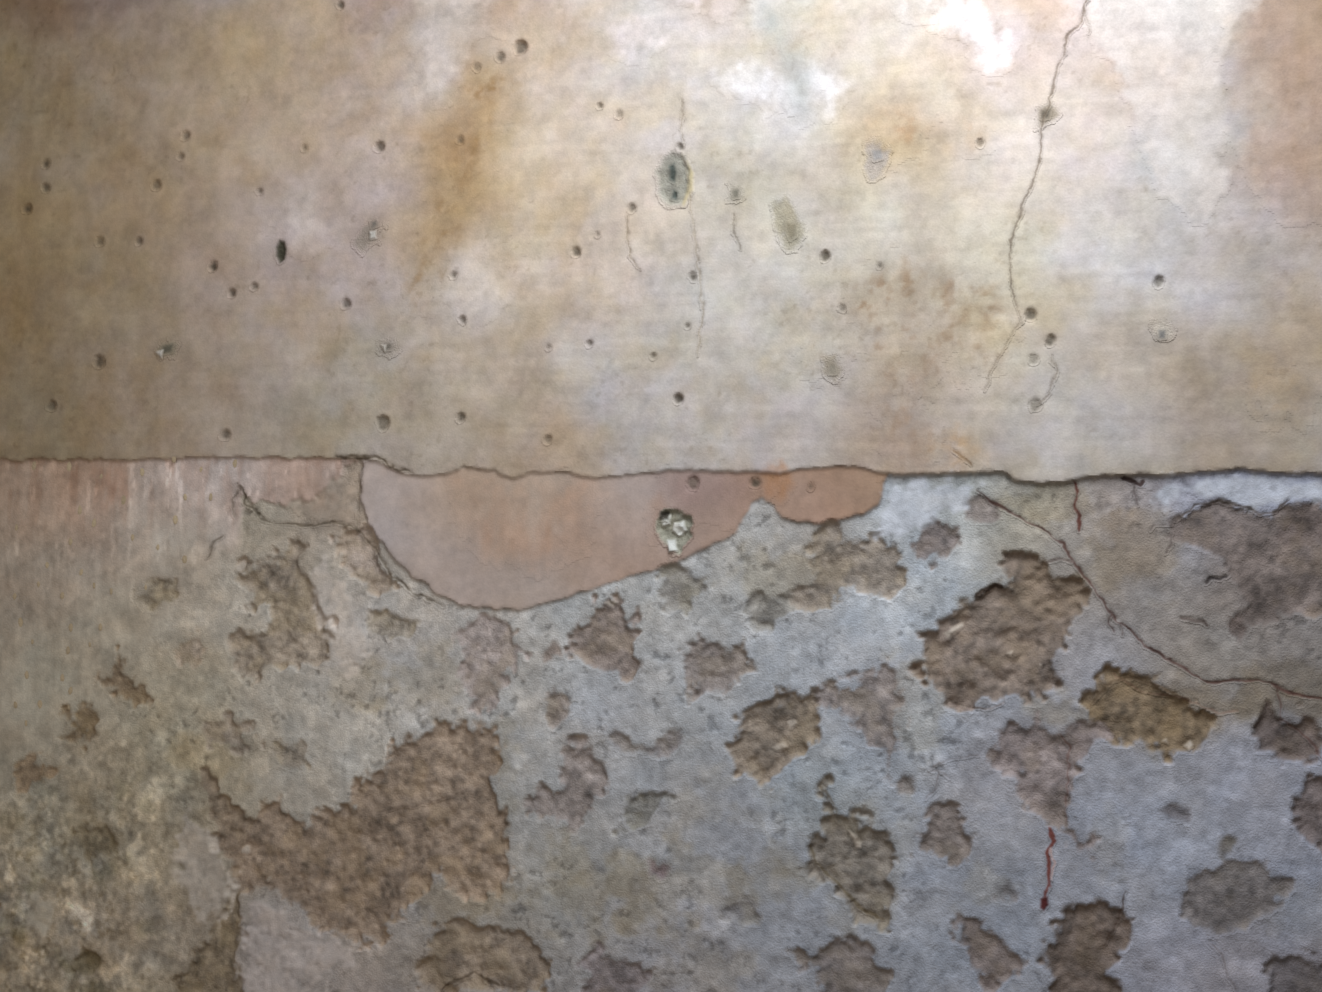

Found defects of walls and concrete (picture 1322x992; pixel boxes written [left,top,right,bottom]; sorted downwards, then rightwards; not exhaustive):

leakage [592,0,674,69]
leakage [673,0,859,129]
leakage [889,0,1022,77]
crack [983,0,1092,393]
crack [204,452,446,608]
crack [946,447,1322,760]
spalling [1162,499,1322,649]
spalling [164,490,1220,992]
crack [1058,733,1073,825]
spalling [1248,695,1322,860]
spalling [1178,830,1297,940]
spalling [1260,943,1322,992]